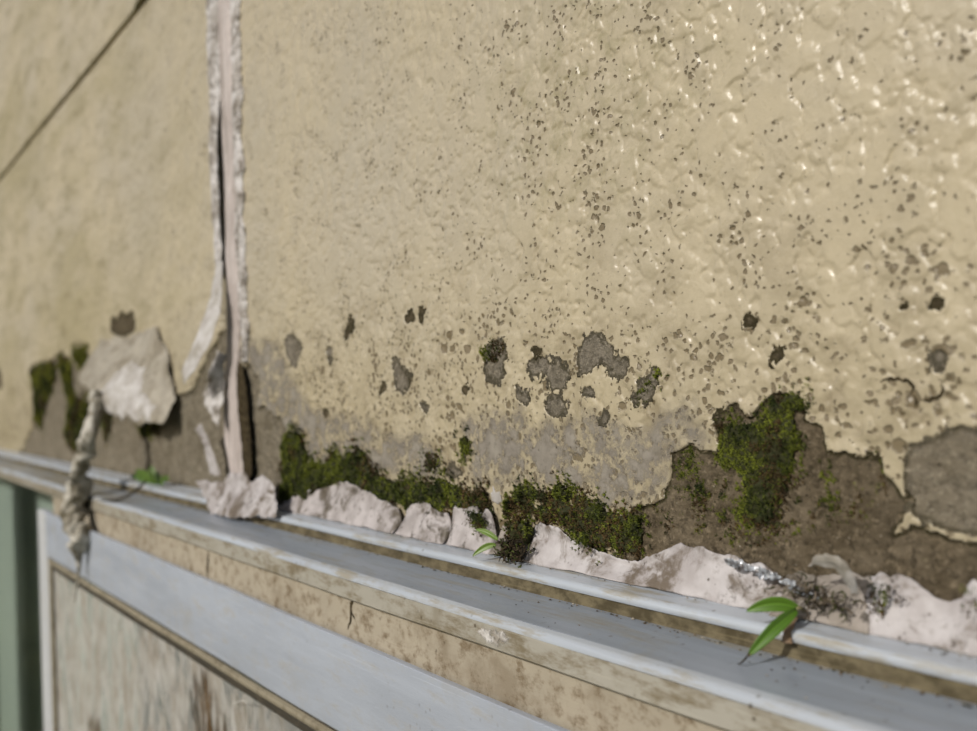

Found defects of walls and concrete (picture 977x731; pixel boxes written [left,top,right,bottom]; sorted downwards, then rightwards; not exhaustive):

peeling [343,314,356,340]
peeling [405,306,427,324]
peeling [741,312,758,330]
peeling [928,293,945,311]
spalling [20,261,230,489]
peeling [378,356,414,396]
peeling [483,336,511,387]
peeling [515,330,662,418]
peeling [768,344,787,369]
spalling [243,364,286,505]
water stain [464,409,699,509]
spalling [617,393,977,602]